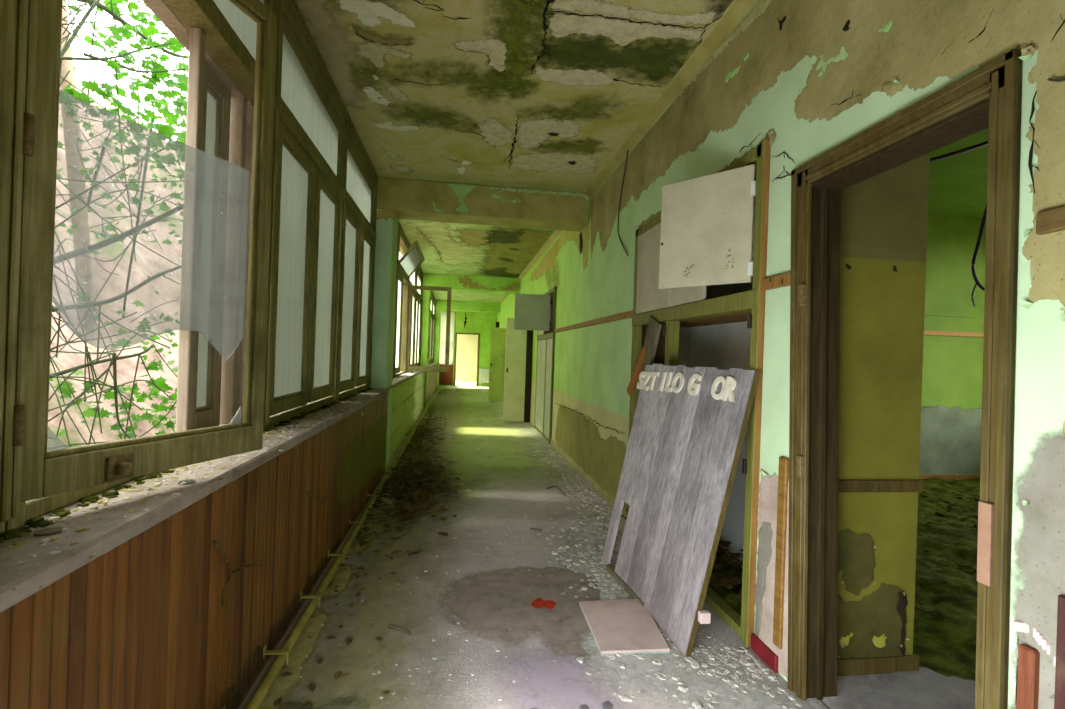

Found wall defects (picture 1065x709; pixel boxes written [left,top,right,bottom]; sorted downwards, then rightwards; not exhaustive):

peeling [336,0,417,28]
peeling [356,42,412,106]
crack [414,0,472,20]
leakage [296,0,699,108]
crack [530,0,723,75]
crack [458,117,519,169]
flaking render [372,0,1065,322]
flaking render [555,405,626,508]
leakage [222,389,559,709]
leakage [440,514,821,709]
flaking render [837,529,910,662]
leakage [842,663,975,709]